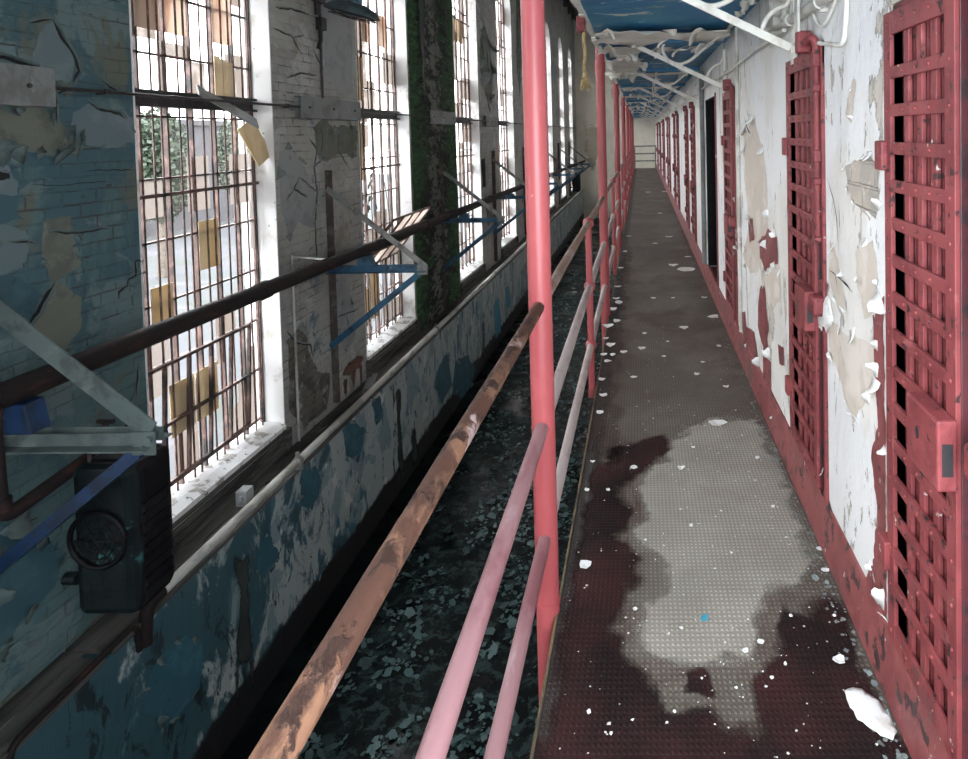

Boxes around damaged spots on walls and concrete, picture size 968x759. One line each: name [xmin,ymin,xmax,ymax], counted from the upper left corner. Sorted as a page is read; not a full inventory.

crack [28,15,123,123]
peeling [591,0,758,115]
peeling [0,102,136,196]
peeling [277,142,318,242]
spalling [841,151,882,220]
peeling [0,216,82,354]
peeling [733,114,784,390]
spalling [285,321,330,430]
rust [343,356,363,395]
peeling [342,396,384,463]
peeling [817,238,888,622]
water stain [534,435,911,759]